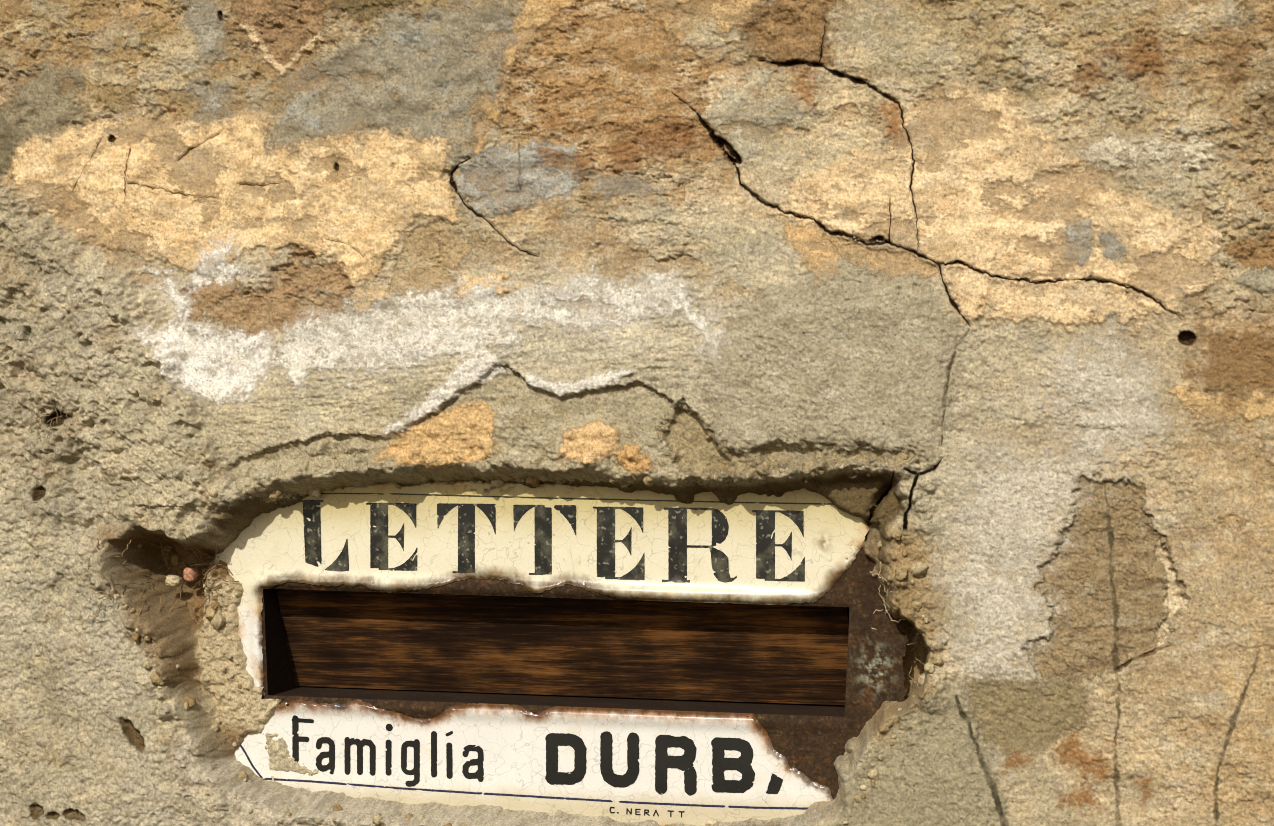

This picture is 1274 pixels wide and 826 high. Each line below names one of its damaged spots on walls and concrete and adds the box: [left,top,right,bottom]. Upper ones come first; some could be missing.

peeling [0,0,841,339]
water stain [136,231,727,439]
crack [450,158,537,256]
spalling [219,365,917,504]
crack [672,25,1182,541]